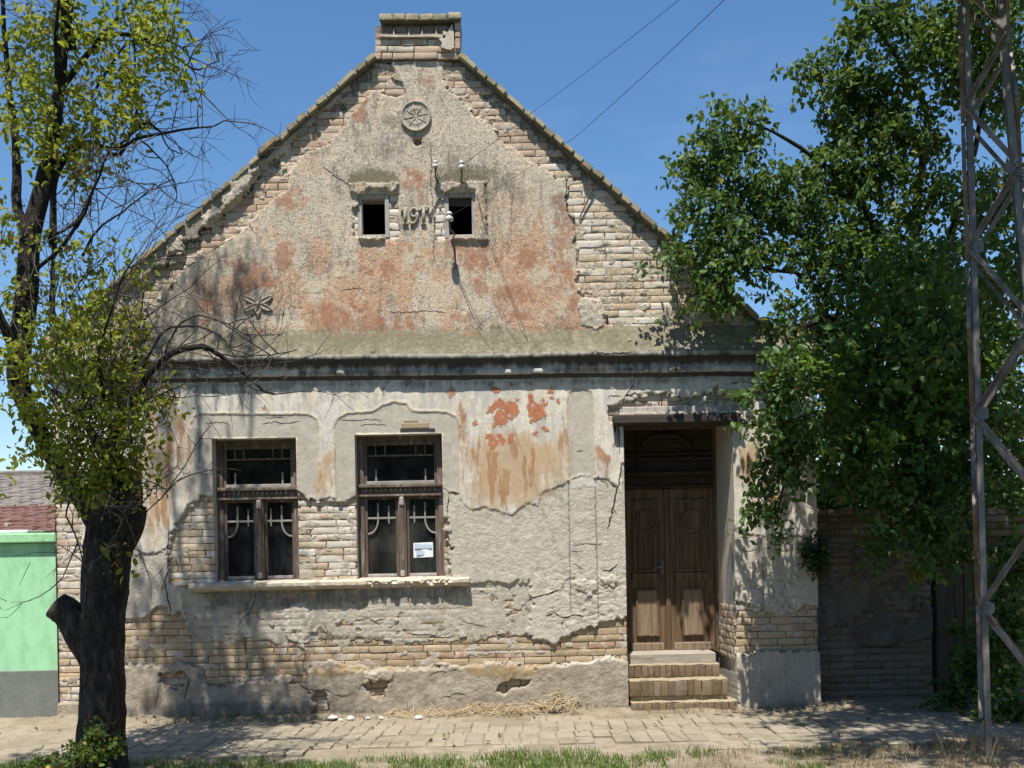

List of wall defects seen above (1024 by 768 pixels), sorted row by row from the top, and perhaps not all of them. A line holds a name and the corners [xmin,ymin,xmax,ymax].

flaking render [445,62,755,341]
peeling [472,382,561,451]
flaking render [608,379,773,426]
crack [521,464,622,628]
flaking render [124,495,627,690]
flaking render [718,542,818,660]
flaking render [313,690,330,713]
flaking render [363,679,389,699]
flaking render [497,680,529,692]